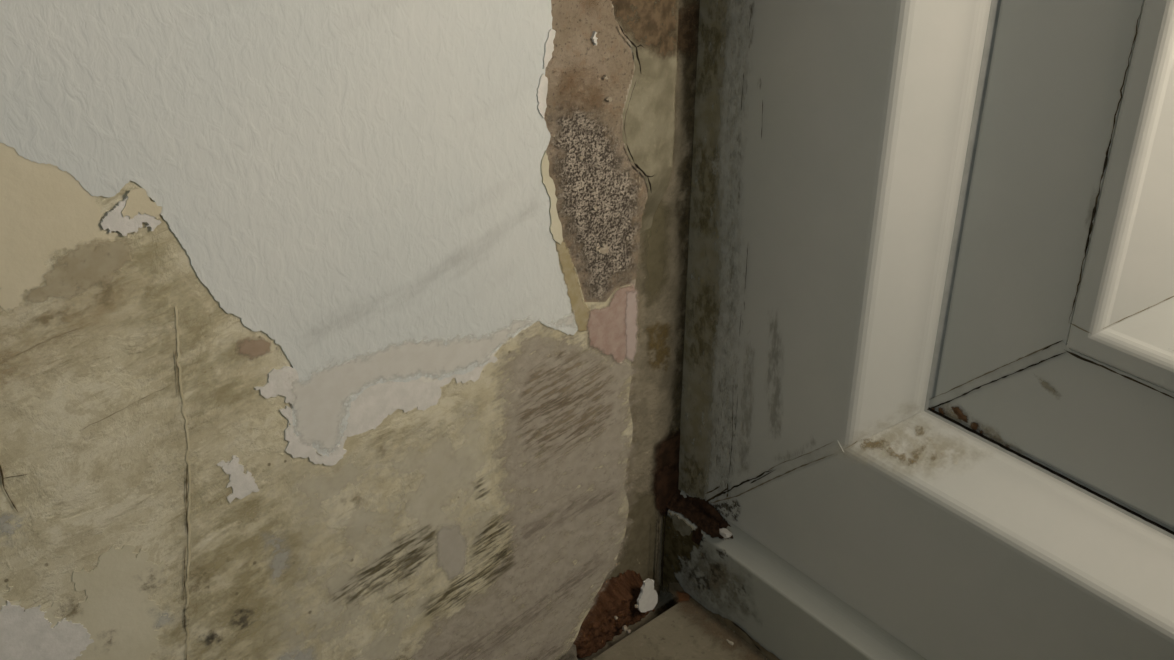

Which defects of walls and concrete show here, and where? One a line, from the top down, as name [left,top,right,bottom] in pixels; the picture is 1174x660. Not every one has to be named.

crack [0,466,27,512]
peeling [0,0,658,660]
corrosion [655,464,733,546]
leakage [607,0,923,613]
leakage [928,340,1174,535]
leakage [1069,3,1174,334]